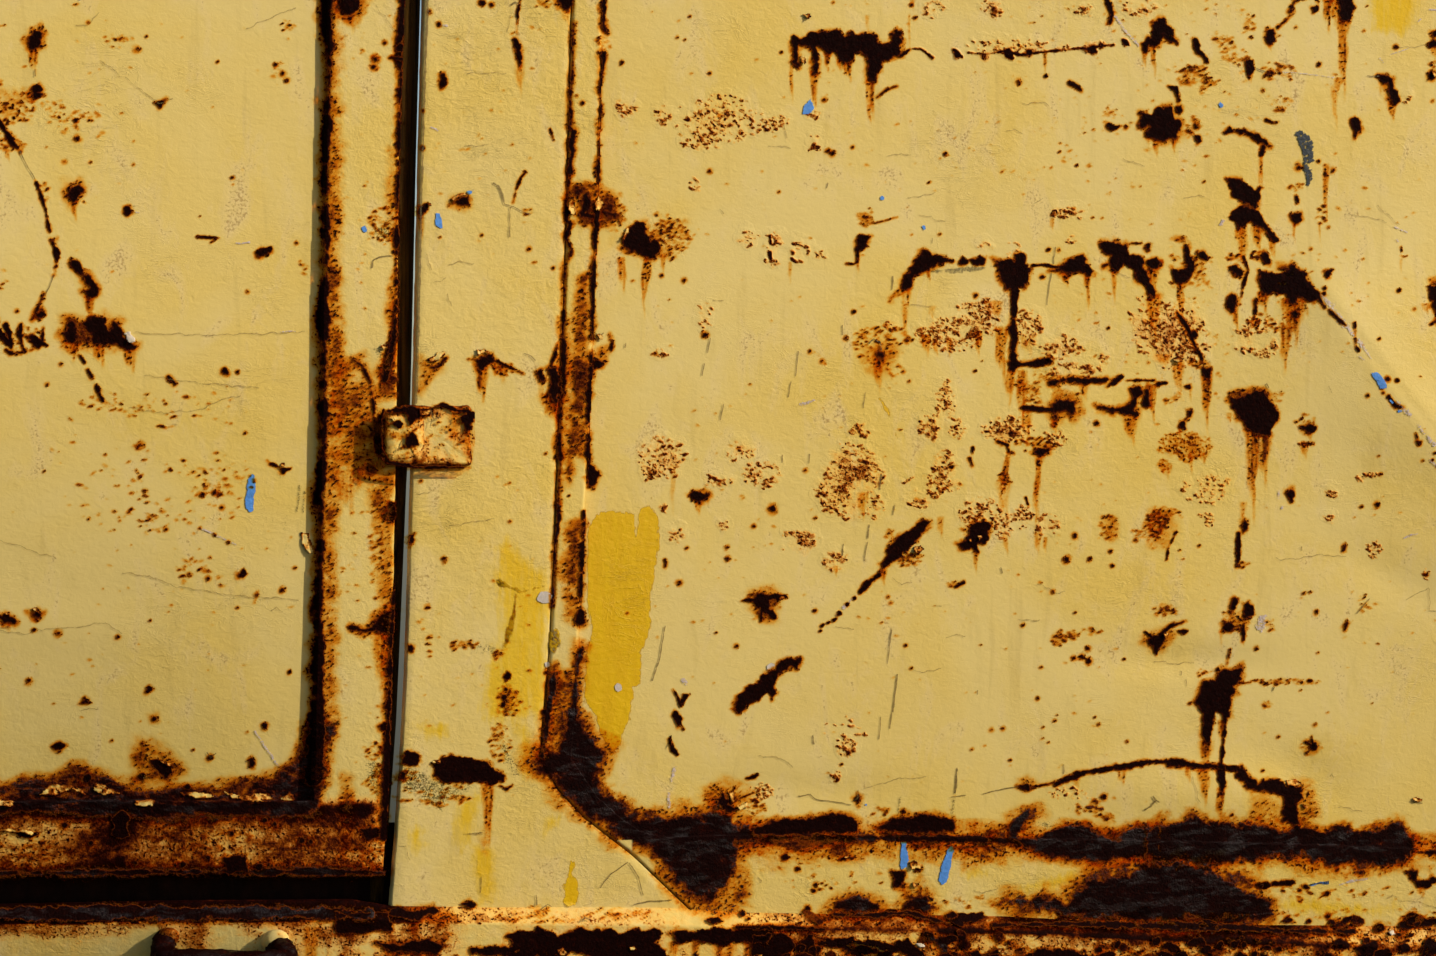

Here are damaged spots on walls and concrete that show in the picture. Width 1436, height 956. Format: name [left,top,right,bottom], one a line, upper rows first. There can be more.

corrosion [254,246,273,259]
corrosion [468,0,695,628]
corrosion [780,0,1369,569]
corrosion [114,441,256,533]
corrosion [269,462,292,475]
corrosion [1318,455,1384,526]
corrosion [178,556,222,586]
corrosion [813,518,933,633]
corrosion [668,678,691,756]
corrosion [730,655,803,715]
corrosion [822,715,869,785]
corrosion [1301,711,1329,756]